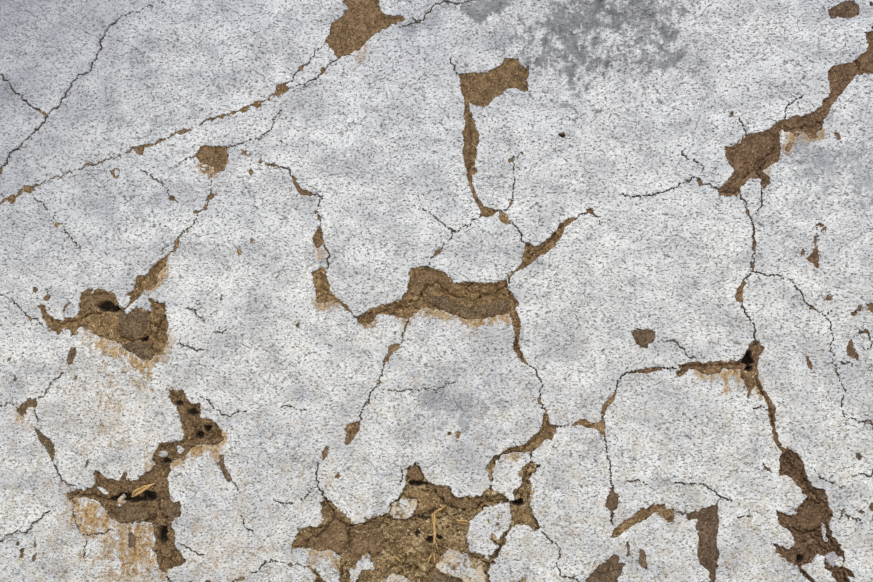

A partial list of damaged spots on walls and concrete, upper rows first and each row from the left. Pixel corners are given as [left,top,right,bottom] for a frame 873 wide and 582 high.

crack [0,0,164,175]
crack [0,41,341,257]
spalling [325,0,405,58]
crack [419,152,523,269]
spalling [678,26,873,214]
spalling [828,0,861,19]
spalling [0,256,169,361]
spalling [178,58,854,582]
crack [735,196,873,430]
spalling [0,347,238,573]
crack [673,482,753,519]
crack [814,469,873,524]